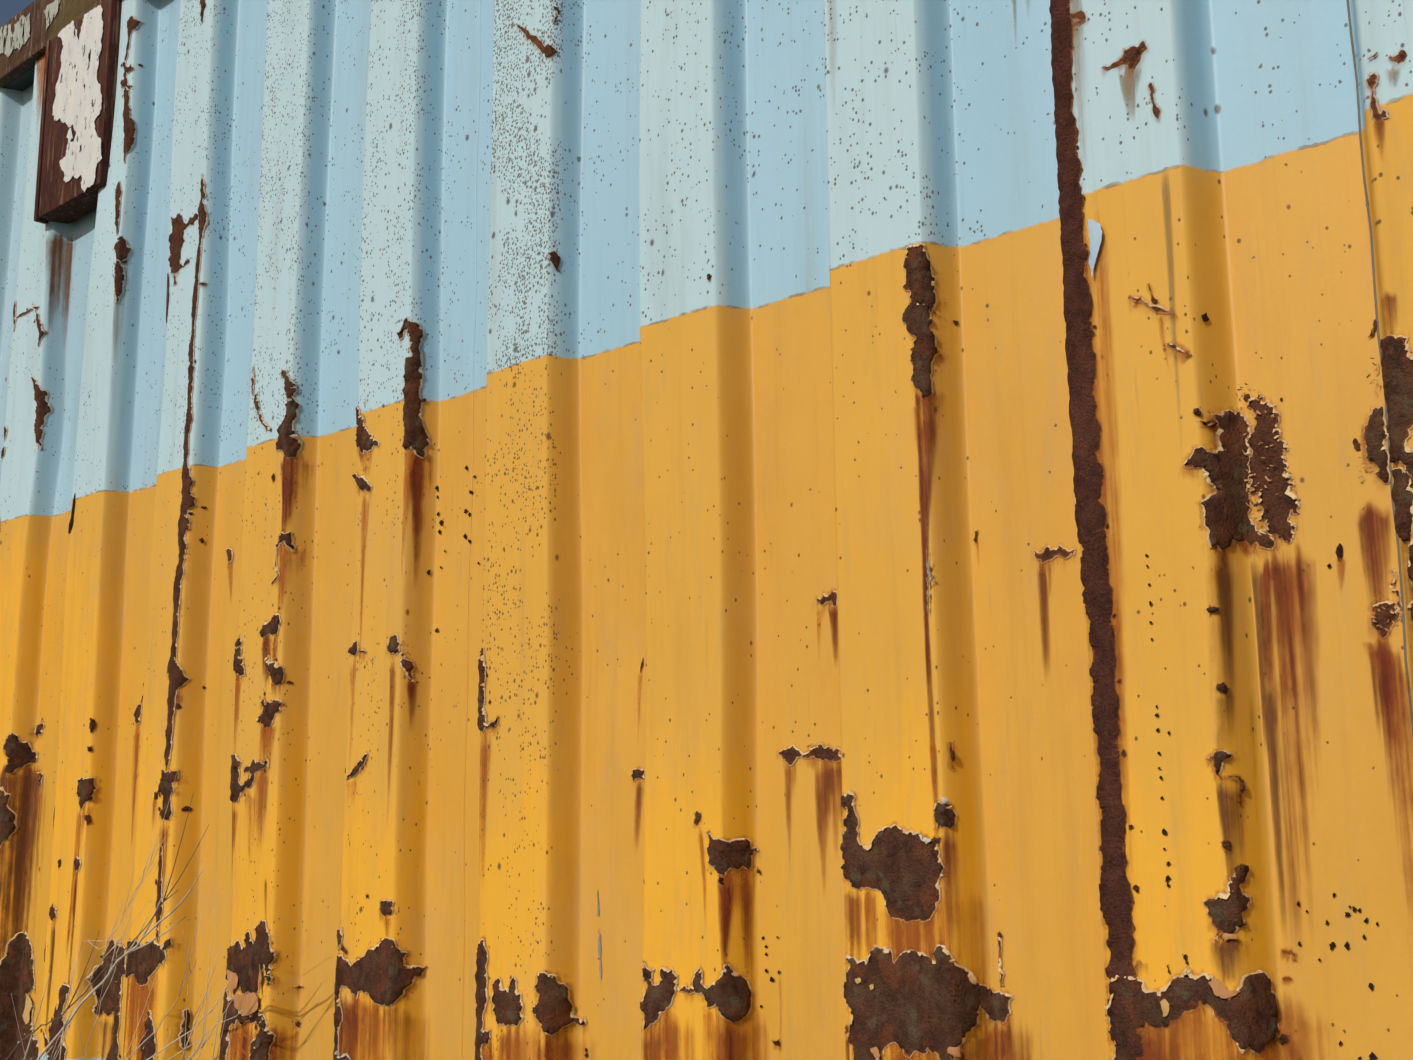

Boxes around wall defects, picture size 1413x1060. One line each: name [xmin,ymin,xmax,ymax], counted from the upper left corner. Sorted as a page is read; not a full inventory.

peeling [0,0,103,192]
corrosion [477,647,499,822]
corrosion [779,243,1014,1060]
corrosion [1034,544,1076,655]
corrosion [1183,383,1314,890]
corrosion [1352,294,1413,802]
corrosion [0,718,173,1060]
corrosion [219,919,300,1060]
corrosion [333,894,427,1060]
corrosion [475,938,587,1060]
corrosion [640,811,780,1060]
corrosion [1105,750,1305,1060]